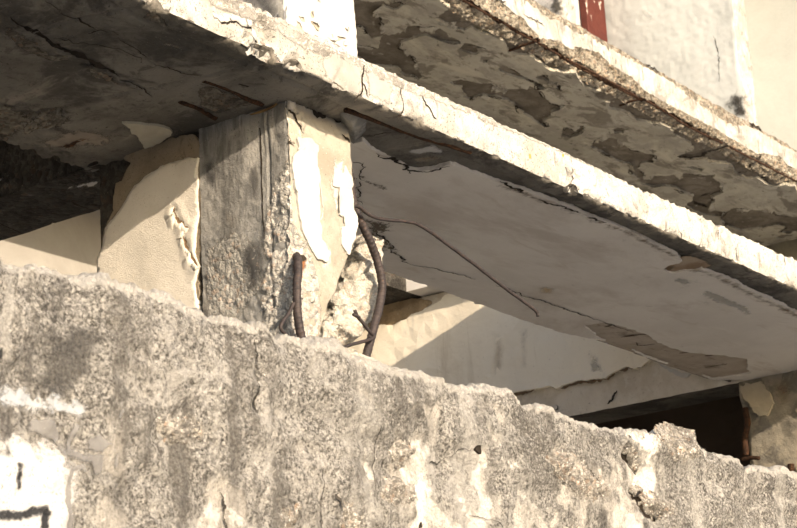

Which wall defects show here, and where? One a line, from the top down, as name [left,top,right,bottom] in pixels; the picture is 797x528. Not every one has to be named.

crack [0,2,193,98]
crack [213,13,258,56]
spalling [321,0,478,104]
spalling [453,66,564,129]
spalling [532,32,751,157]
crack [500,181,607,223]
spalling [593,127,792,239]
spalling [205,137,358,337]
spalling [368,298,432,327]
spalling [585,323,749,379]
crack [513,365,645,410]
flaking render [740,381,775,417]